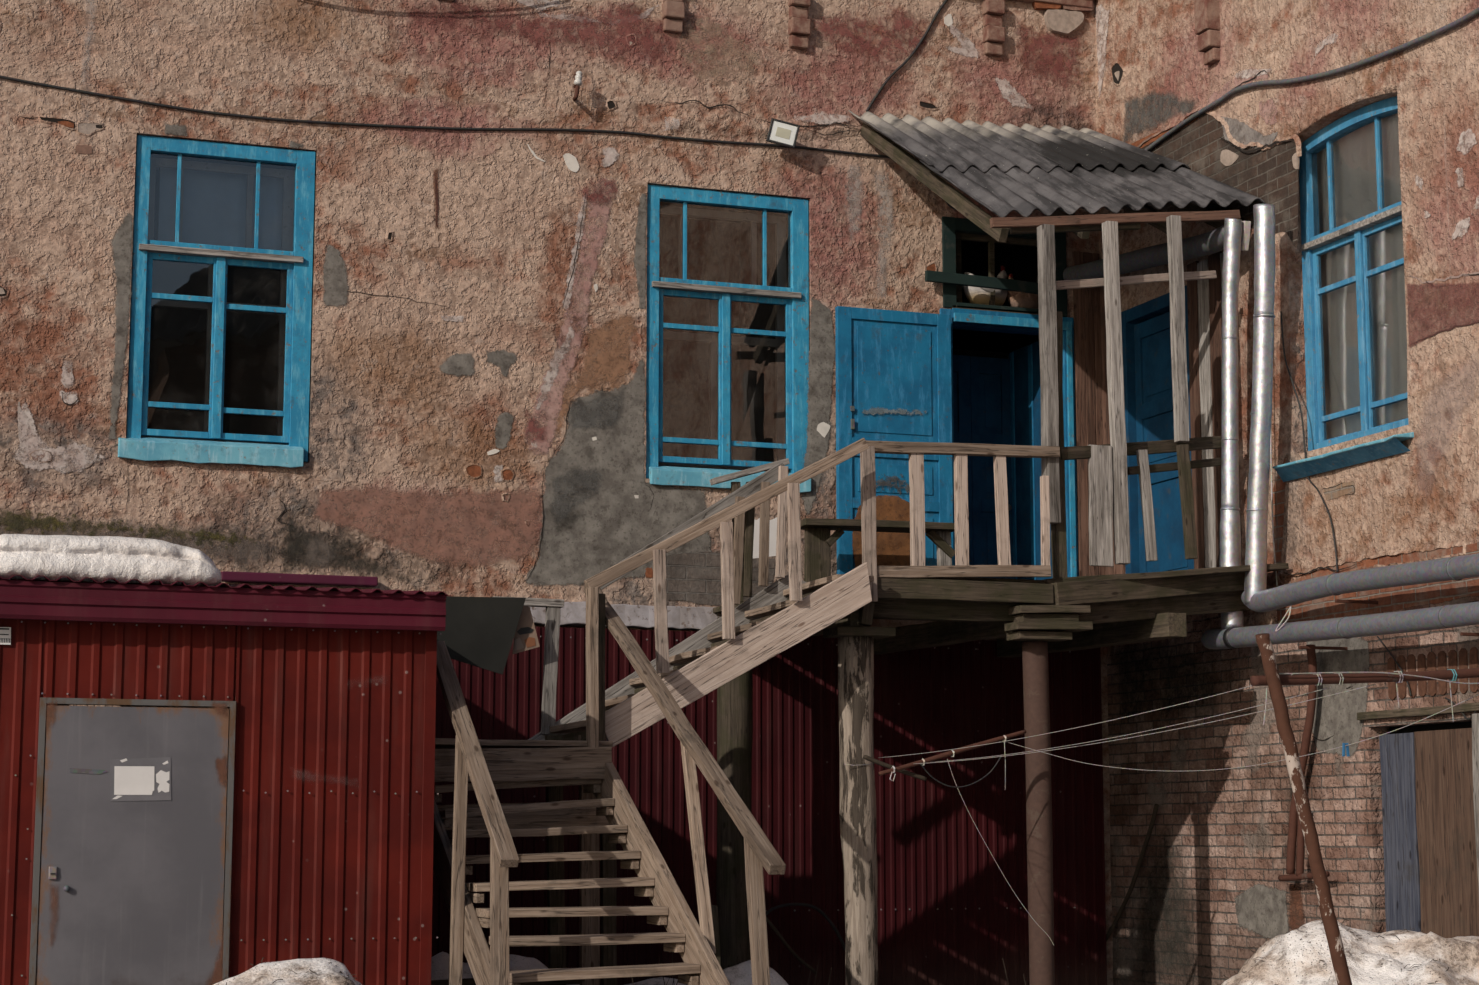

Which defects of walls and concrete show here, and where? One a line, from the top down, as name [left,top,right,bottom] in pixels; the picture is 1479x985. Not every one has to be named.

flaking render [1032,1,1125,95]
spalling [1131,68,1302,247]